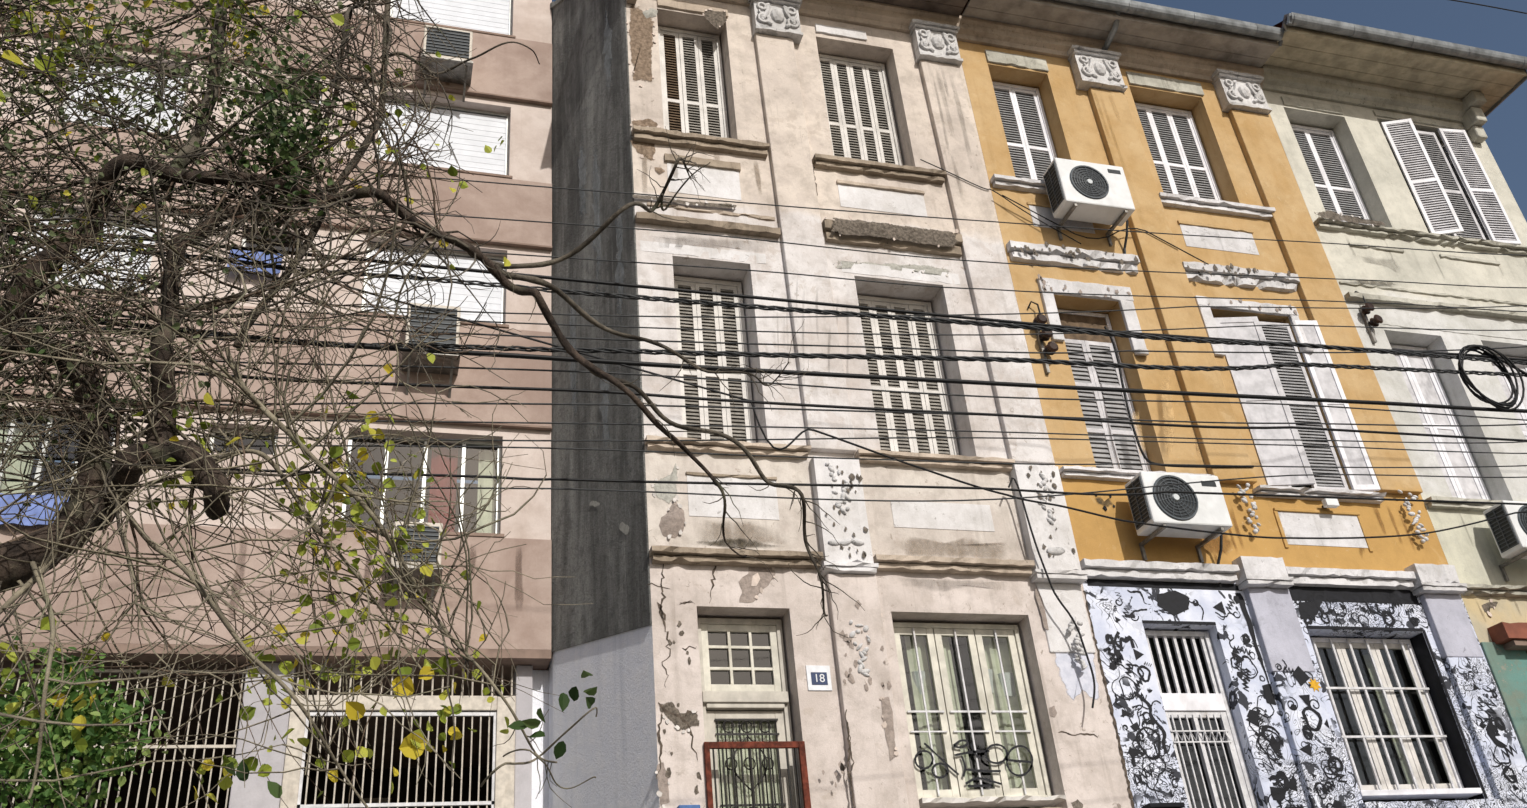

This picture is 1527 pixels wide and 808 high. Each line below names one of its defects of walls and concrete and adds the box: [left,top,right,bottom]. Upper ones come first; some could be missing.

peeling [626,5,658,87]
spalling [825,216,959,247]
peeling [833,259,949,277]
spalling [739,567,776,603]
crack [647,564,717,779]
spalling [660,702,699,734]
spalling [655,752,673,808]